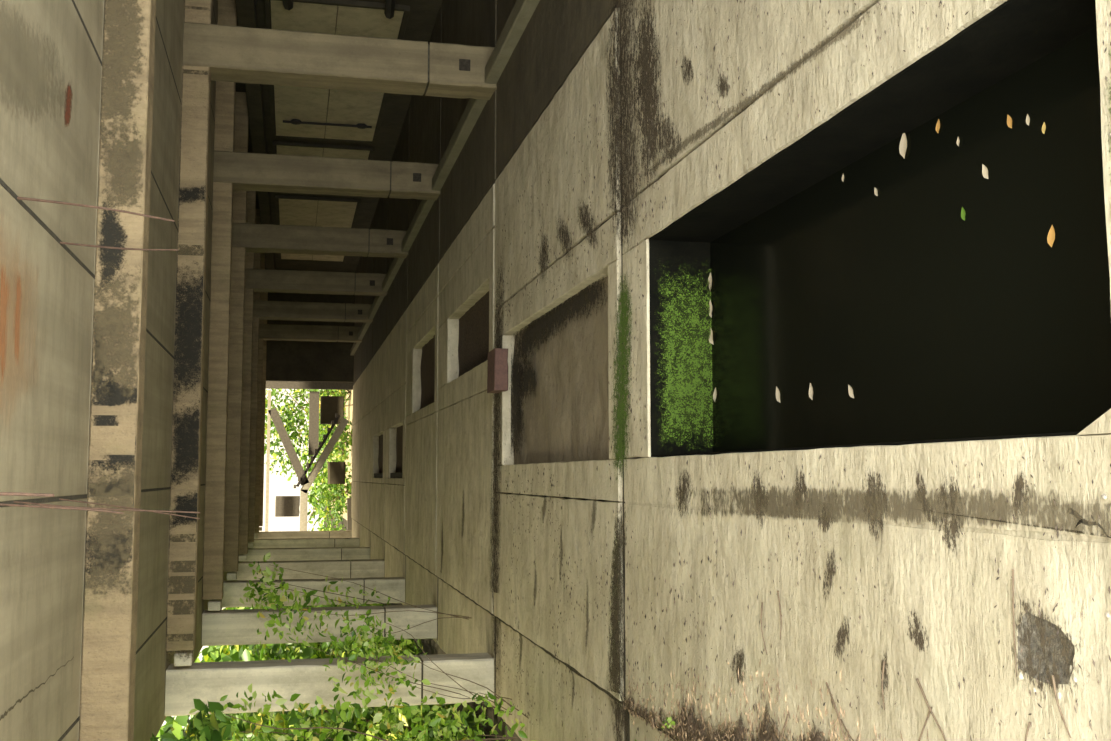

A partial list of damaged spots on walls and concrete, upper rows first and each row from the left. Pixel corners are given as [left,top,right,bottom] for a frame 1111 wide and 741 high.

leakage [606,0,681,233]
leakage [91,0,144,426]
leakage [539,201,598,279]
leakage [85,437,136,594]
leakage [676,469,691,516]
leakage [752,471,764,527]
leakage [794,470,807,498]
leakage [818,507,833,532]
leakage [862,472,886,538]
leakage [916,469,963,552]
leakage [1012,471,1028,520]
crack [0,658,73,720]